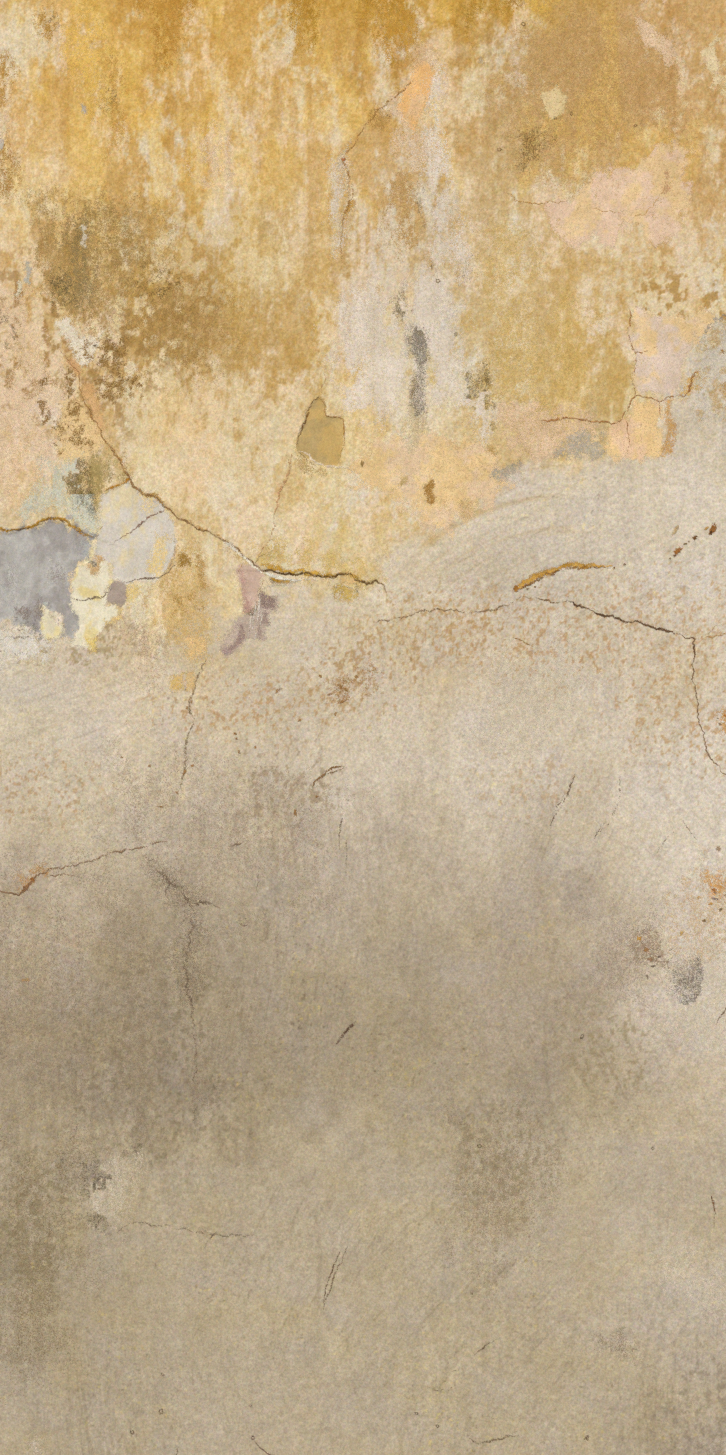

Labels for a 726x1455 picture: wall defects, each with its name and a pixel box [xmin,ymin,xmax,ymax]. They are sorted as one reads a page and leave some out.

damp [0,48,21,107]
damp [30,1,140,162]
damp [283,0,321,66]
damp [453,0,715,203]
spalling [0,261,178,654]
damp [0,131,267,540]
spalling [167,561,279,692]
crack [61,352,726,787]
damp [313,0,615,487]
crack [0,841,218,1123]
damp [0,720,390,1403]
damp [439,1076,569,1300]